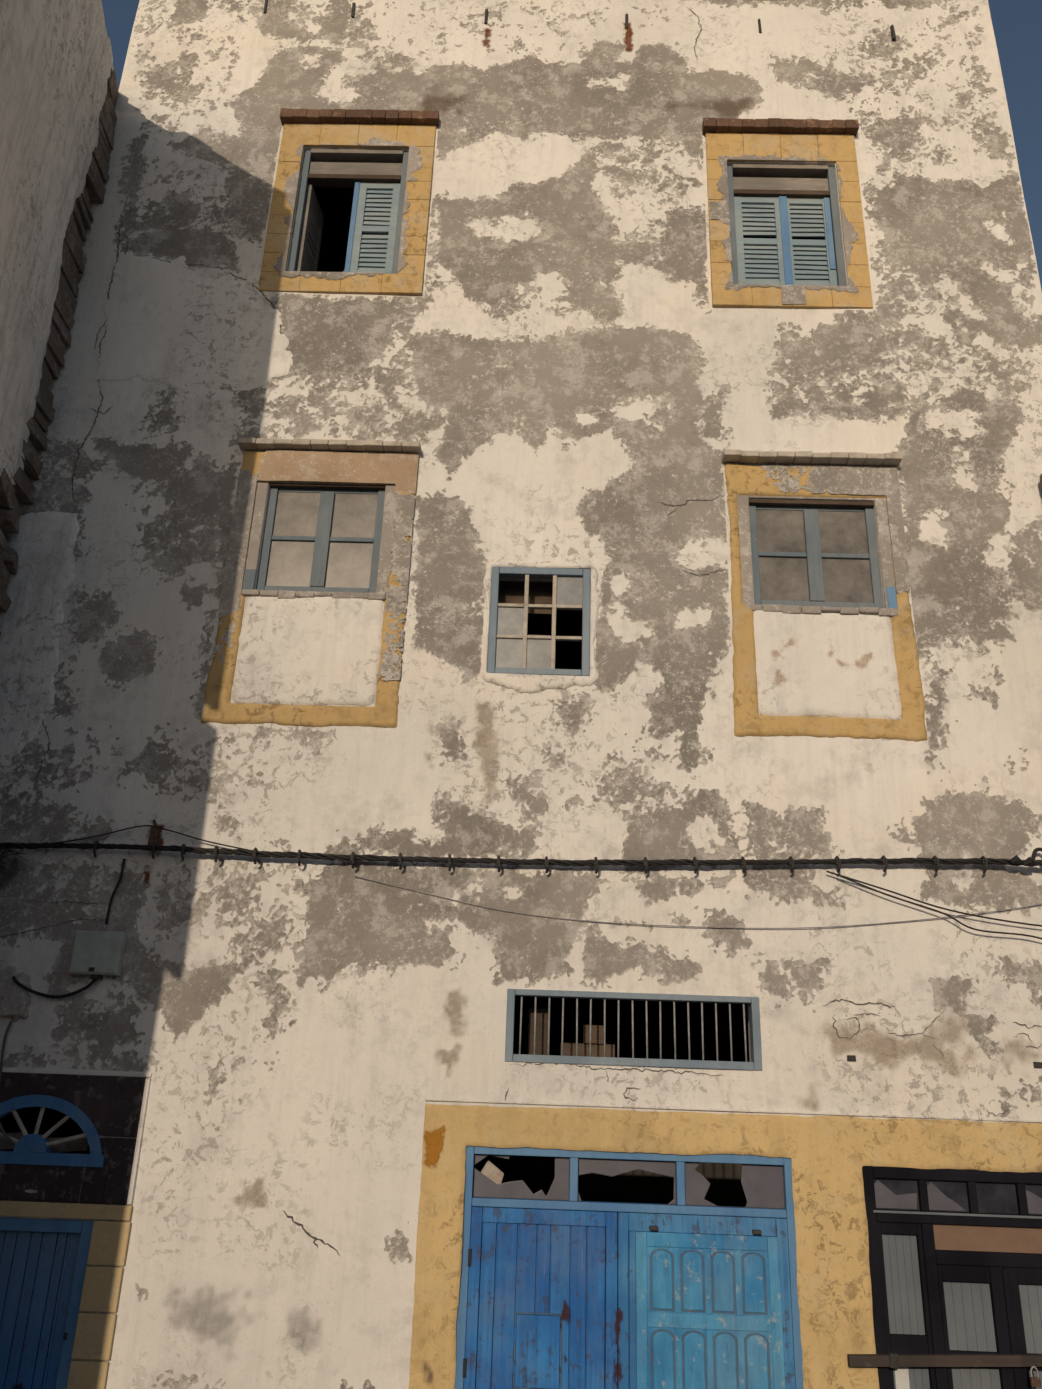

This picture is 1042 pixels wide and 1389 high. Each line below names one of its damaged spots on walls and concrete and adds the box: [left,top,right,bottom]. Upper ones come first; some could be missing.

crack [72,189,292,509]
peeling [0,0,1042,1106]
crack [283,1211,340,1256]
peeling [382,1219,412,1265]
peeling [135,1283,148,1302]
peeling [151,1354,226,1389]
peeling [340,1379,375,1389]